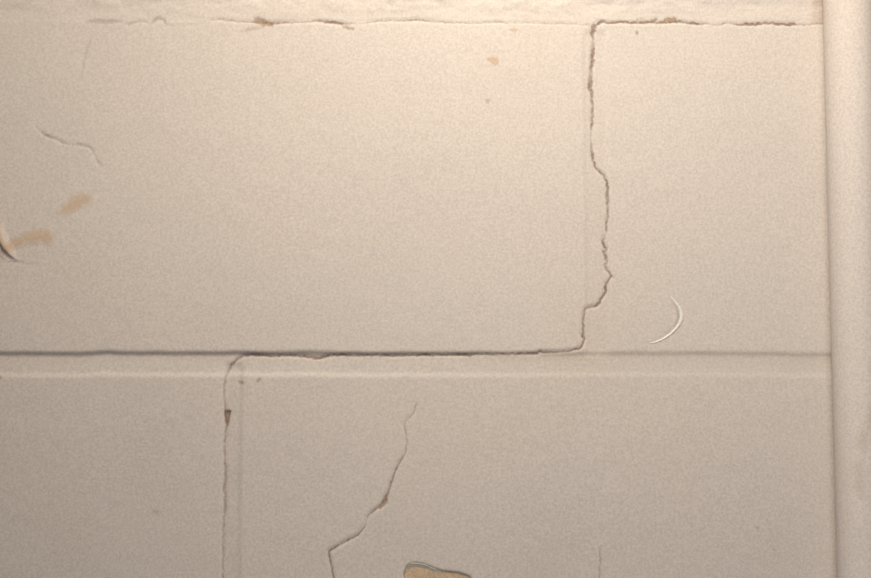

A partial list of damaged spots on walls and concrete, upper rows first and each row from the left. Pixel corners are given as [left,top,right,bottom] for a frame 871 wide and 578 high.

crack [741,20,796,28]
crack [588,18,699,126]
crack [234,153,610,363]
crack [224,411,232,425]
peeling [404,563,470,578]